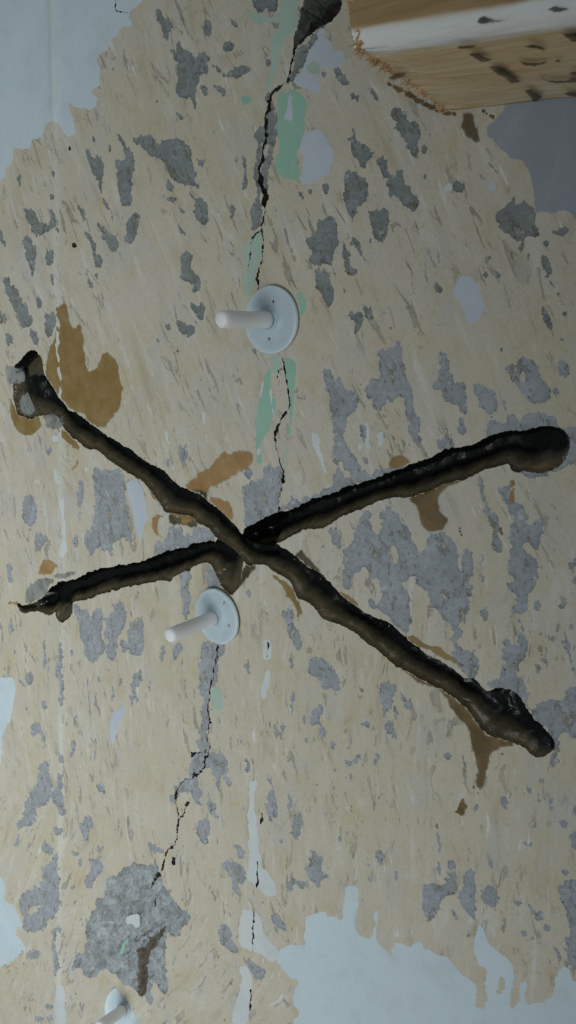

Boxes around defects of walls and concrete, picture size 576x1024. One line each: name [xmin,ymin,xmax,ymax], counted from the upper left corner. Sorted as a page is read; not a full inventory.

peeling [0,0,142,187]
spalling [77,133,209,289]
crack [248,0,342,290]
peeling [487,97,576,296]
water stain [5,304,123,470]
water stain [186,451,252,520]
crack [273,353,291,512]
peeling [0,276,576,780]
water stain [409,480,460,531]
crack [151,645,219,907]
peeling [221,758,329,897]
peeling [218,823,576,1024]